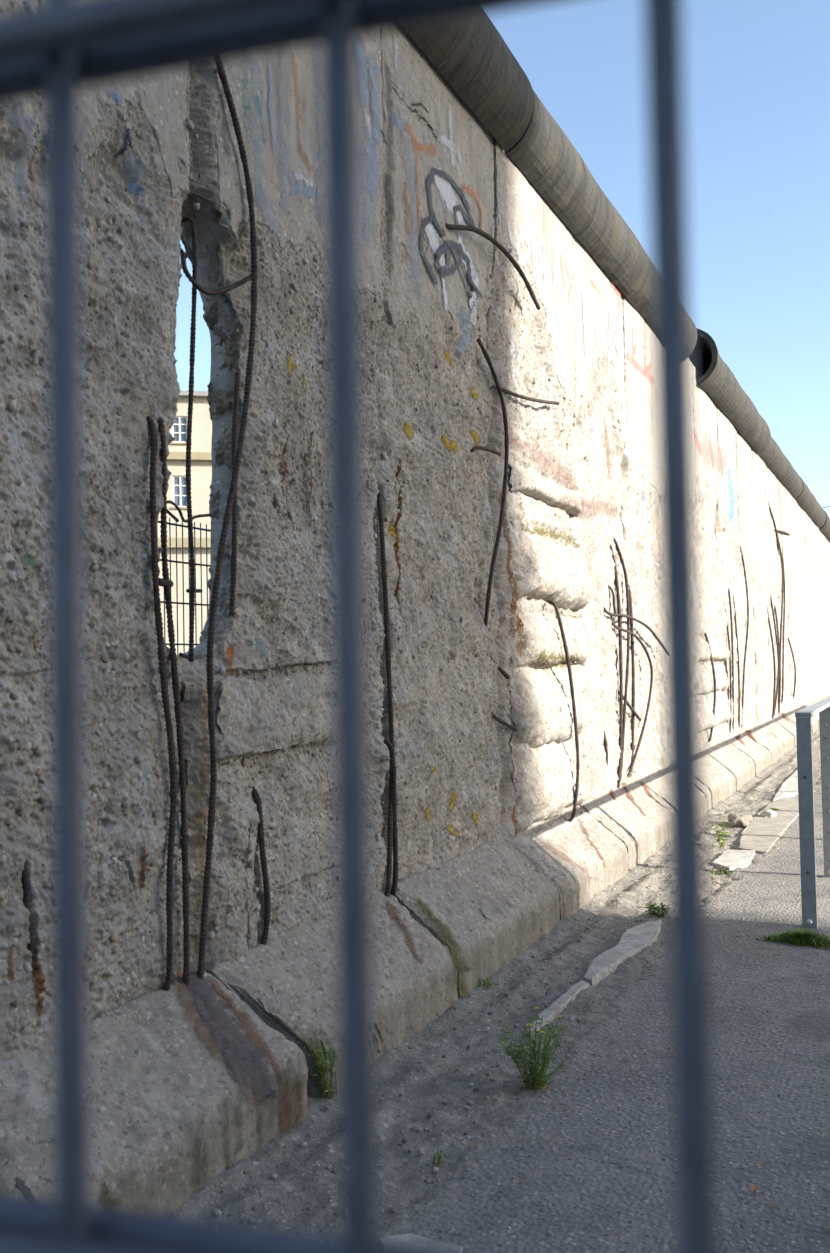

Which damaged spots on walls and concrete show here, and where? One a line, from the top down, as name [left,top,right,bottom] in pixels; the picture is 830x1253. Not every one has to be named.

spalling [0,0,40,16]
spalling [0,95,54,1060]
spalling [78,64,337,1022]
corrosion [393,459,407,627]
spalling [355,33,665,901]
corrosion [499,495,525,657]
spalling [693,404,801,752]
corrosion [9,932,46,1017]
corrosion [172,968,305,1134]